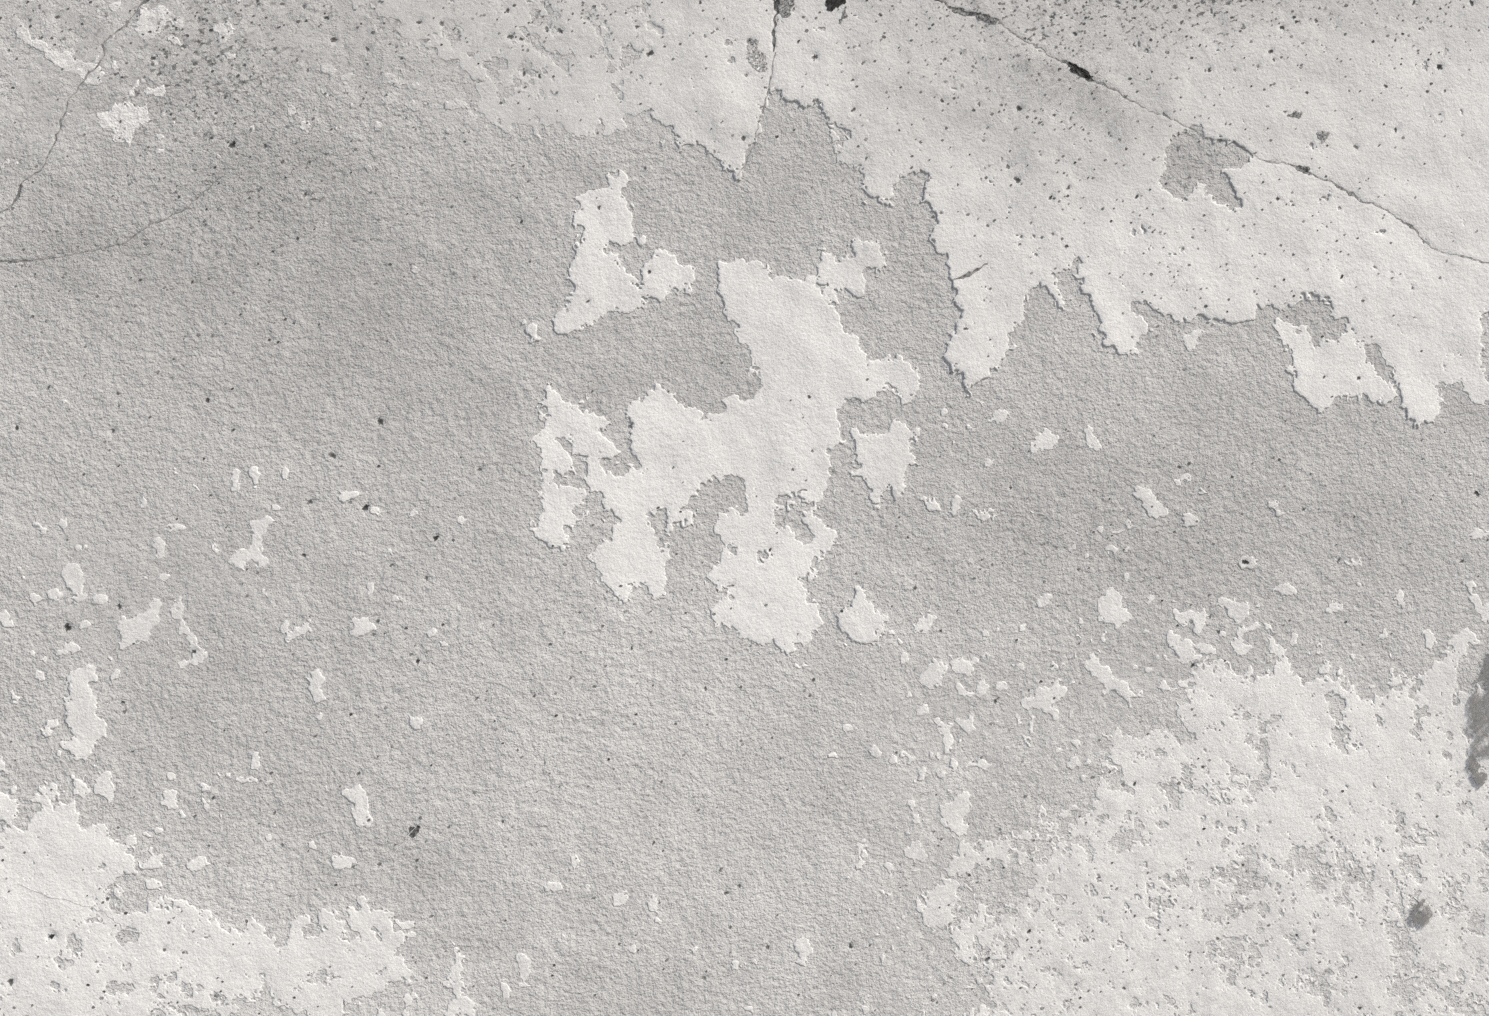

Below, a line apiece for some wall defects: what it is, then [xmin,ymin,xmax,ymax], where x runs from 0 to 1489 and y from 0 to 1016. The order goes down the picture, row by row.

peeling [15,25,118,86]
crack [0,0,149,213]
crack [0,176,222,263]
peeling [55,0,239,154]
crack [738,0,780,175]
peeling [287,0,1489,429]
crack [953,263,988,280]
crack [937,0,1489,263]
peeling [211,504,281,570]
peeling [529,236,1489,1016]
peeling [0,524,434,1016]
peeling [443,941,476,1016]